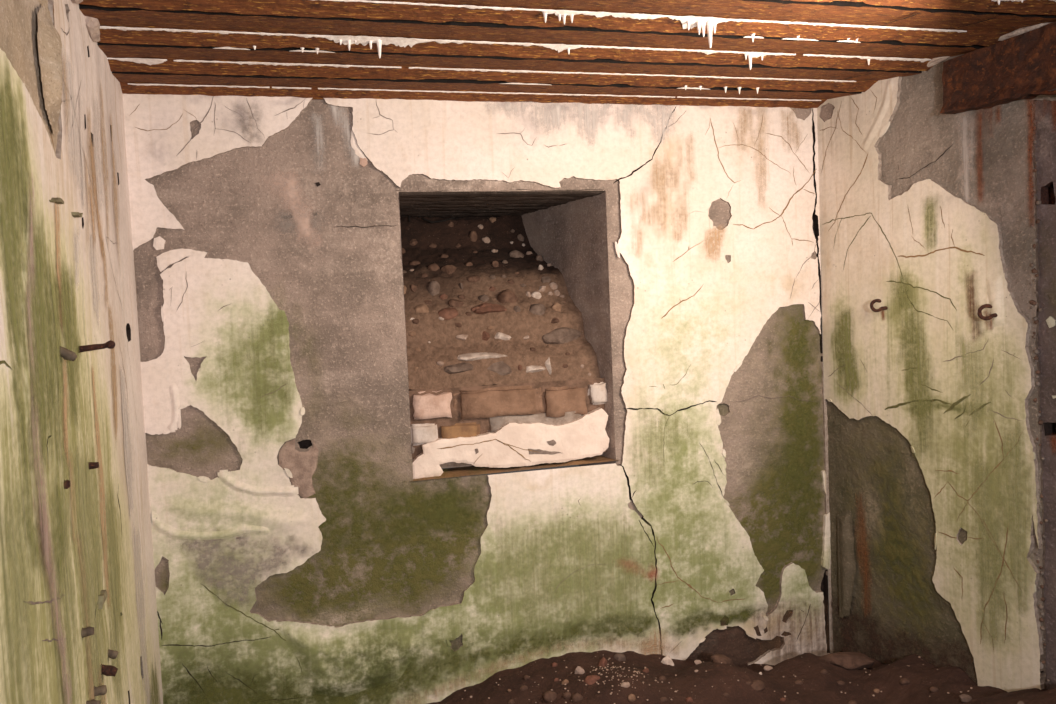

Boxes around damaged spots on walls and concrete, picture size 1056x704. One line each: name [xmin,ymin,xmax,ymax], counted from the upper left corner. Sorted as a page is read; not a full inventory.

spalling [0,0,70,160]
damp [100,0,967,140]
crack [613,107,686,184]
damp [19,235,133,704]
damp [186,537,306,601]
spalling [126,98,635,628]
crack [617,464,742,655]
crack [624,364,813,453]
spalling [688,304,978,684]
crack [705,73,1022,653]
spalling [874,54,1056,690]
rust [968,275,991,334]